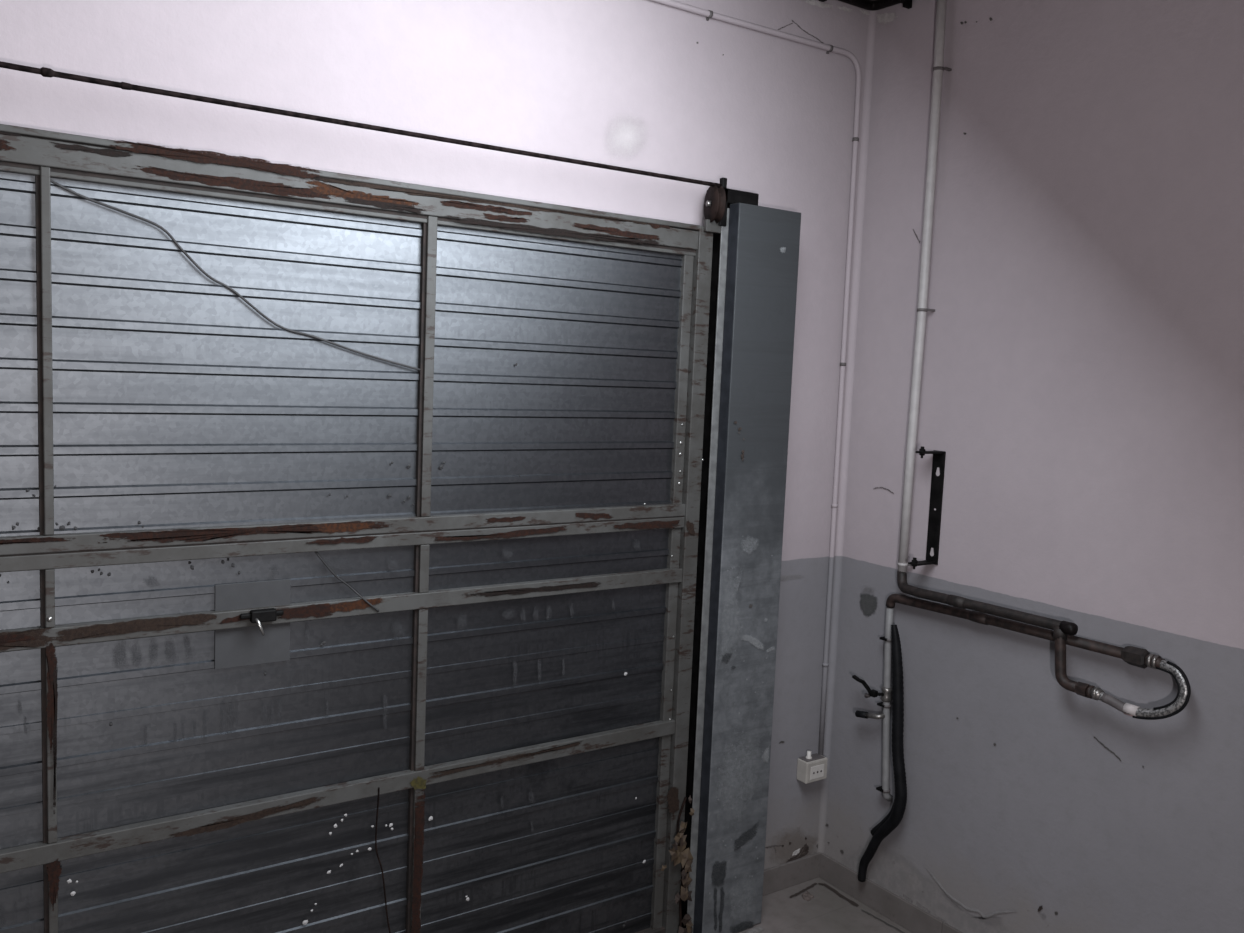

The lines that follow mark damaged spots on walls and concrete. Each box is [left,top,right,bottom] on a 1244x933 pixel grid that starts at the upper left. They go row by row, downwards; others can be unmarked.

rust [0,131,20,151]
rust [49,140,670,517]
rust [0,175,73,545]
rust [98,521,394,545]
rust [434,513,695,541]
rust [276,597,387,619]
rust [463,582,601,597]
rust [0,570,250,843]
rust [405,609,582,933]
rust [169,796,326,837]
rust [43,859,62,933]